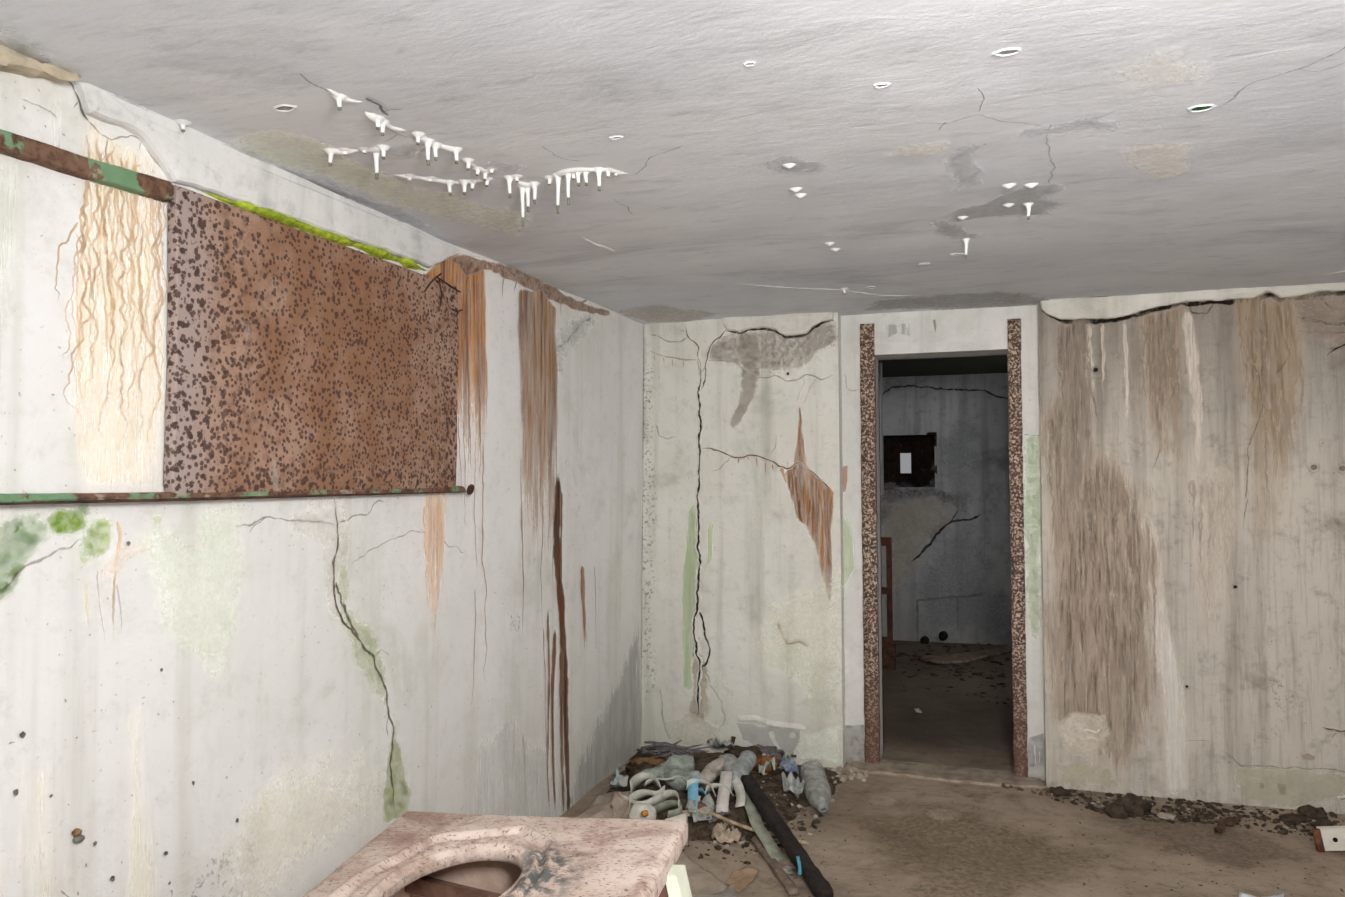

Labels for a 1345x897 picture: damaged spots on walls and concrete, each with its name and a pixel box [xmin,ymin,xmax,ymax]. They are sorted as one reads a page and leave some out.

water stain [243,88,628,231]
water stain [55,180,168,423]
water stain [1123,308,1202,449]
crack [987,291,1345,355]
water stain [1235,294,1345,487]
rust [423,255,610,810]
crack [654,320,835,724]
rust [786,408,847,600]
water stain [1042,321,1184,791]
crack [332,505,395,811]
water stain [1028,734,1045,781]
crack [1323,726,1345,734]